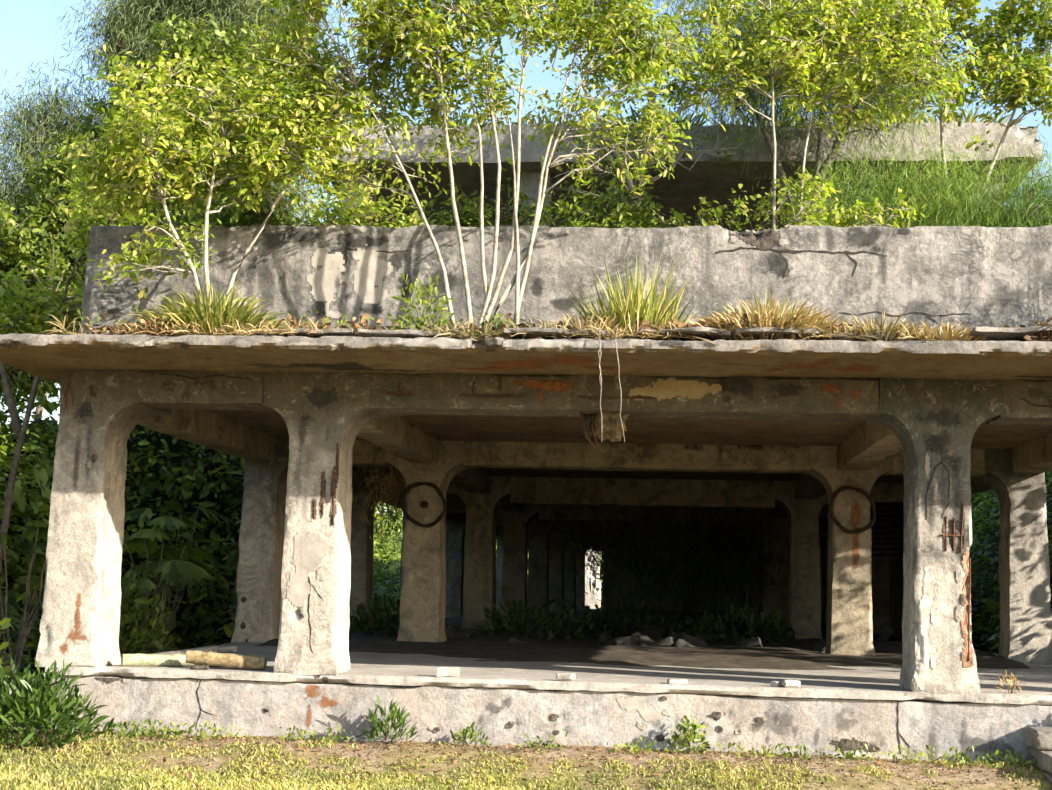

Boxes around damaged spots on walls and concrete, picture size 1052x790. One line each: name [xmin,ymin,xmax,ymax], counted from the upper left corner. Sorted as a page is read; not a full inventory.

crack [715,247,887,279]
rust [461,356,617,403]
peeling [578,377,722,401]
spalling [287,448,299,507]
spalling [312,443,340,525]
rust [851,501,861,568]
rust [61,594,86,653]
crack [308,576,324,653]
crack [196,680,213,727]
rust [306,685,337,727]